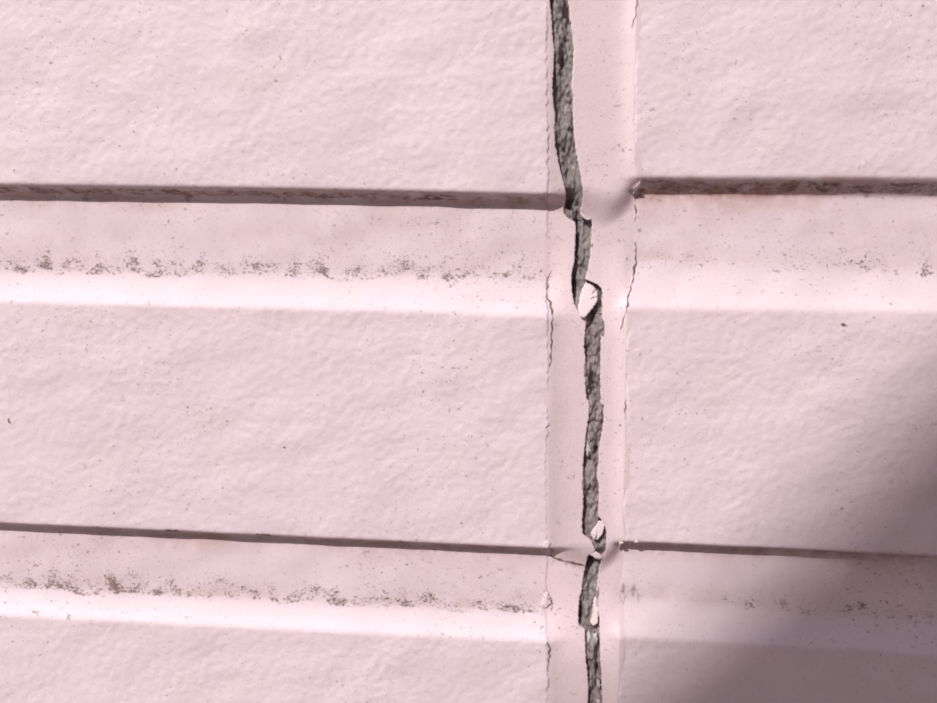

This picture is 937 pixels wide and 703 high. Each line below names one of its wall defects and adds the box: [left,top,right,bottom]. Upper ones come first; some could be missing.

crack [546,0,637,703]
water stain [91,575,190,596]
water stain [270,587,359,606]